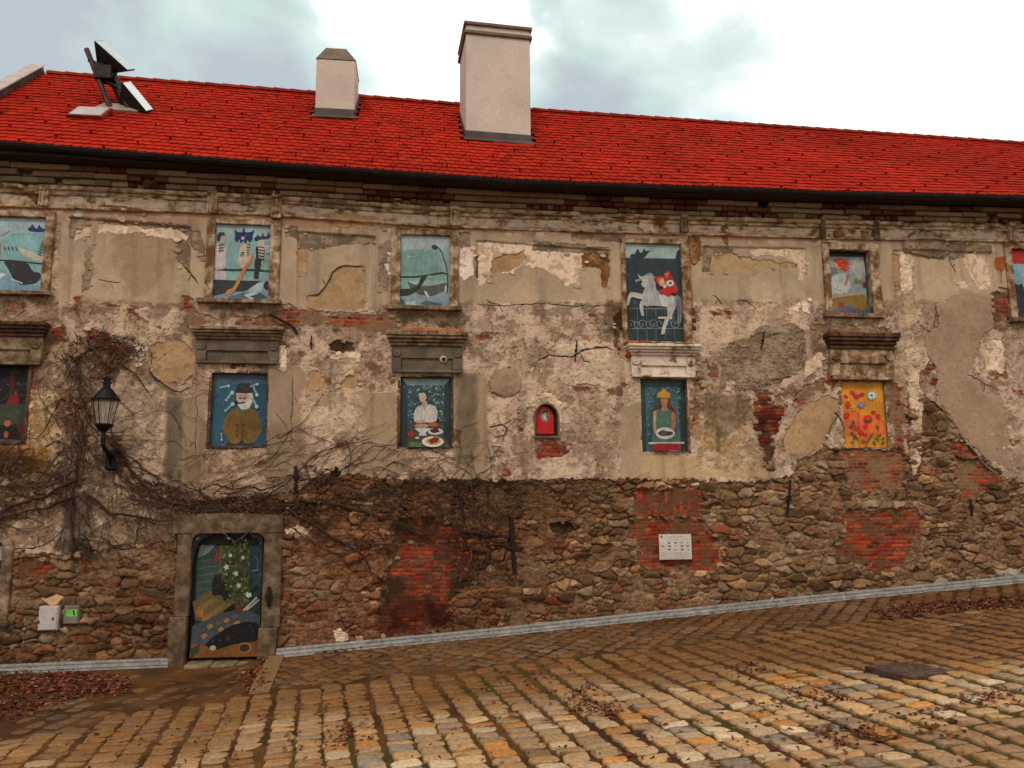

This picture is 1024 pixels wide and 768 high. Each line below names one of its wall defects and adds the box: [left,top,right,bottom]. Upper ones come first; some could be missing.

peeling [68,188,206,343]
flaking render [179,197,400,392]
crack [312,264,363,296]
peeling [459,225,626,289]
flaking render [688,223,809,283]
flaking render [130,340,196,384]
crack [529,346,614,369]
flaking render [177,298,1024,649]
flaking render [0,535,178,664]